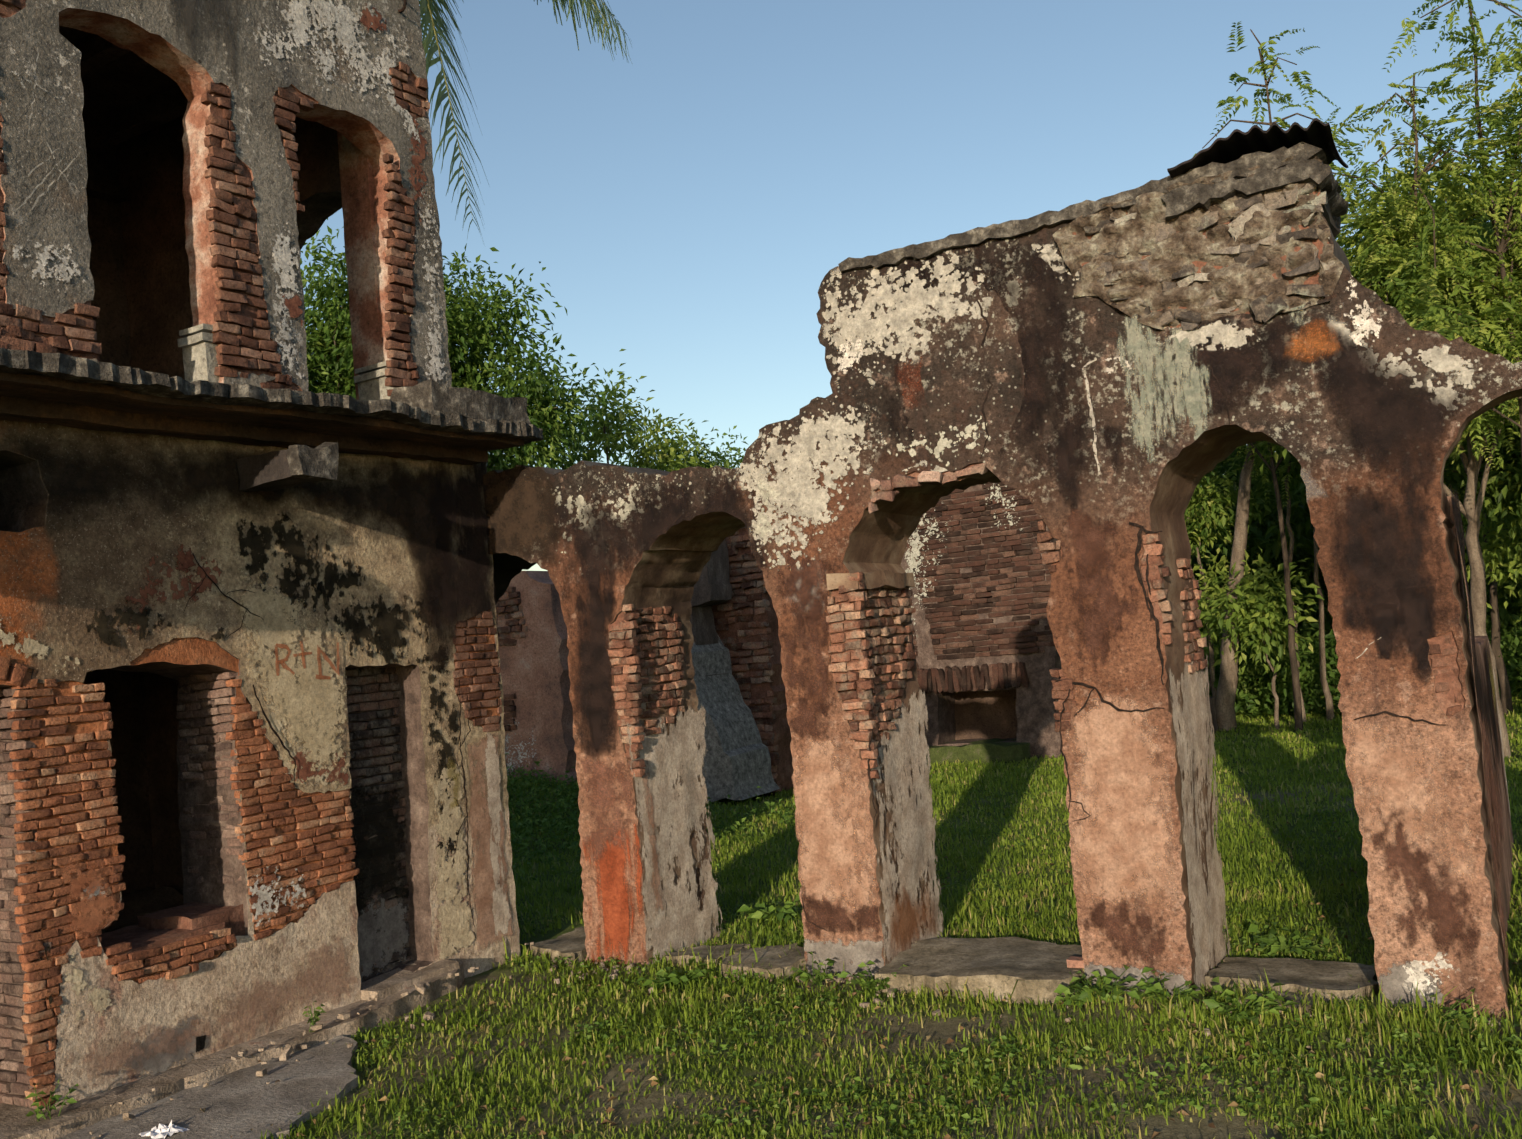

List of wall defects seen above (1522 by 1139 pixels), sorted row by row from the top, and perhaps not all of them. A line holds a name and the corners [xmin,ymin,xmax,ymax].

spalling [0,0,26,17]
spalling [0,113,101,362]
spalling [201,0,447,397]
spalling [0,543,360,1110]
damp [224,512,459,814]
damp [437,830,458,857]
peeling [433,586,537,960]
damp [549,481,836,755]
spalling [711,463,1231,994]
crack [1055,522,1164,821]
damp [1317,326,1458,682]
crack [1354,711,1443,725]